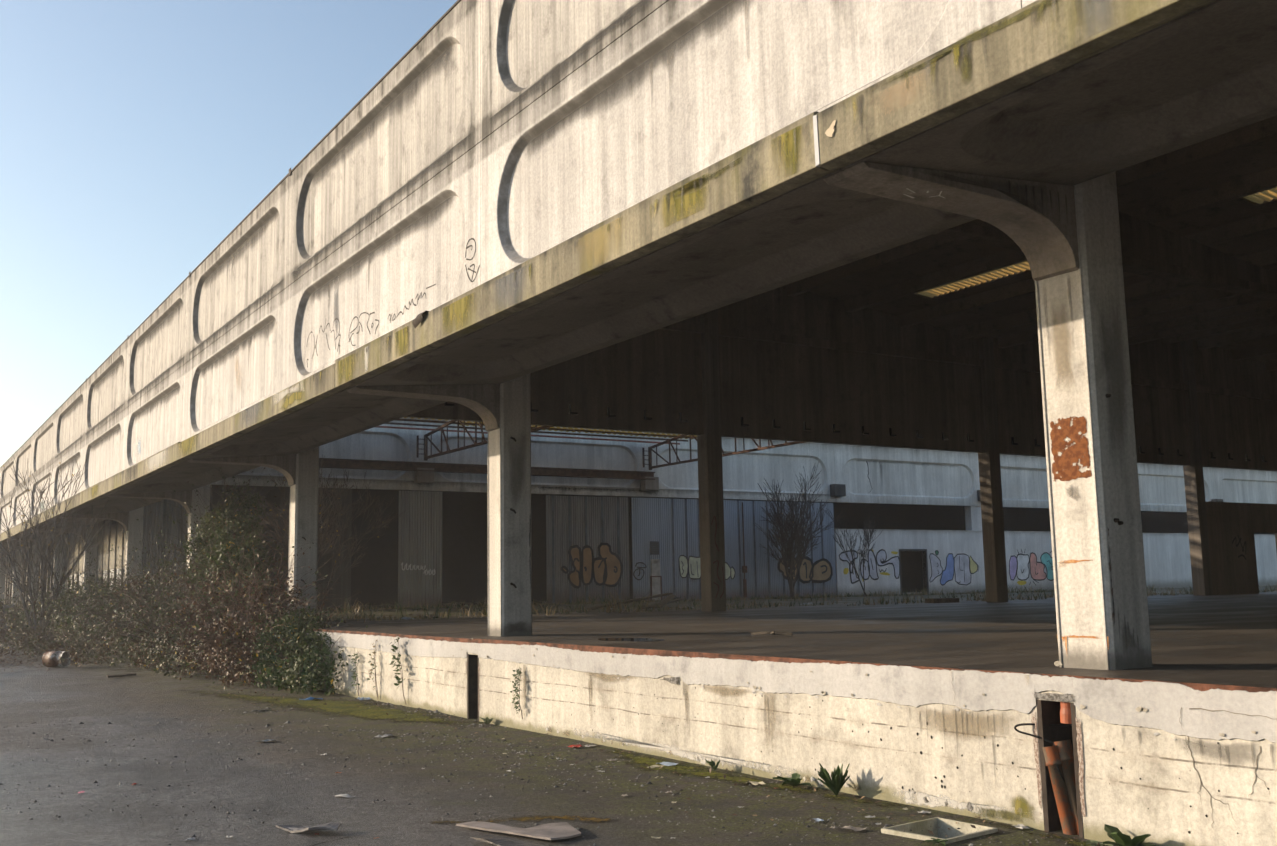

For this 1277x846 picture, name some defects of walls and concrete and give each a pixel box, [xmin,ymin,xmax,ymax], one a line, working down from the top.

leakage [498,265,531,299]
crack [1180,707,1271,825]